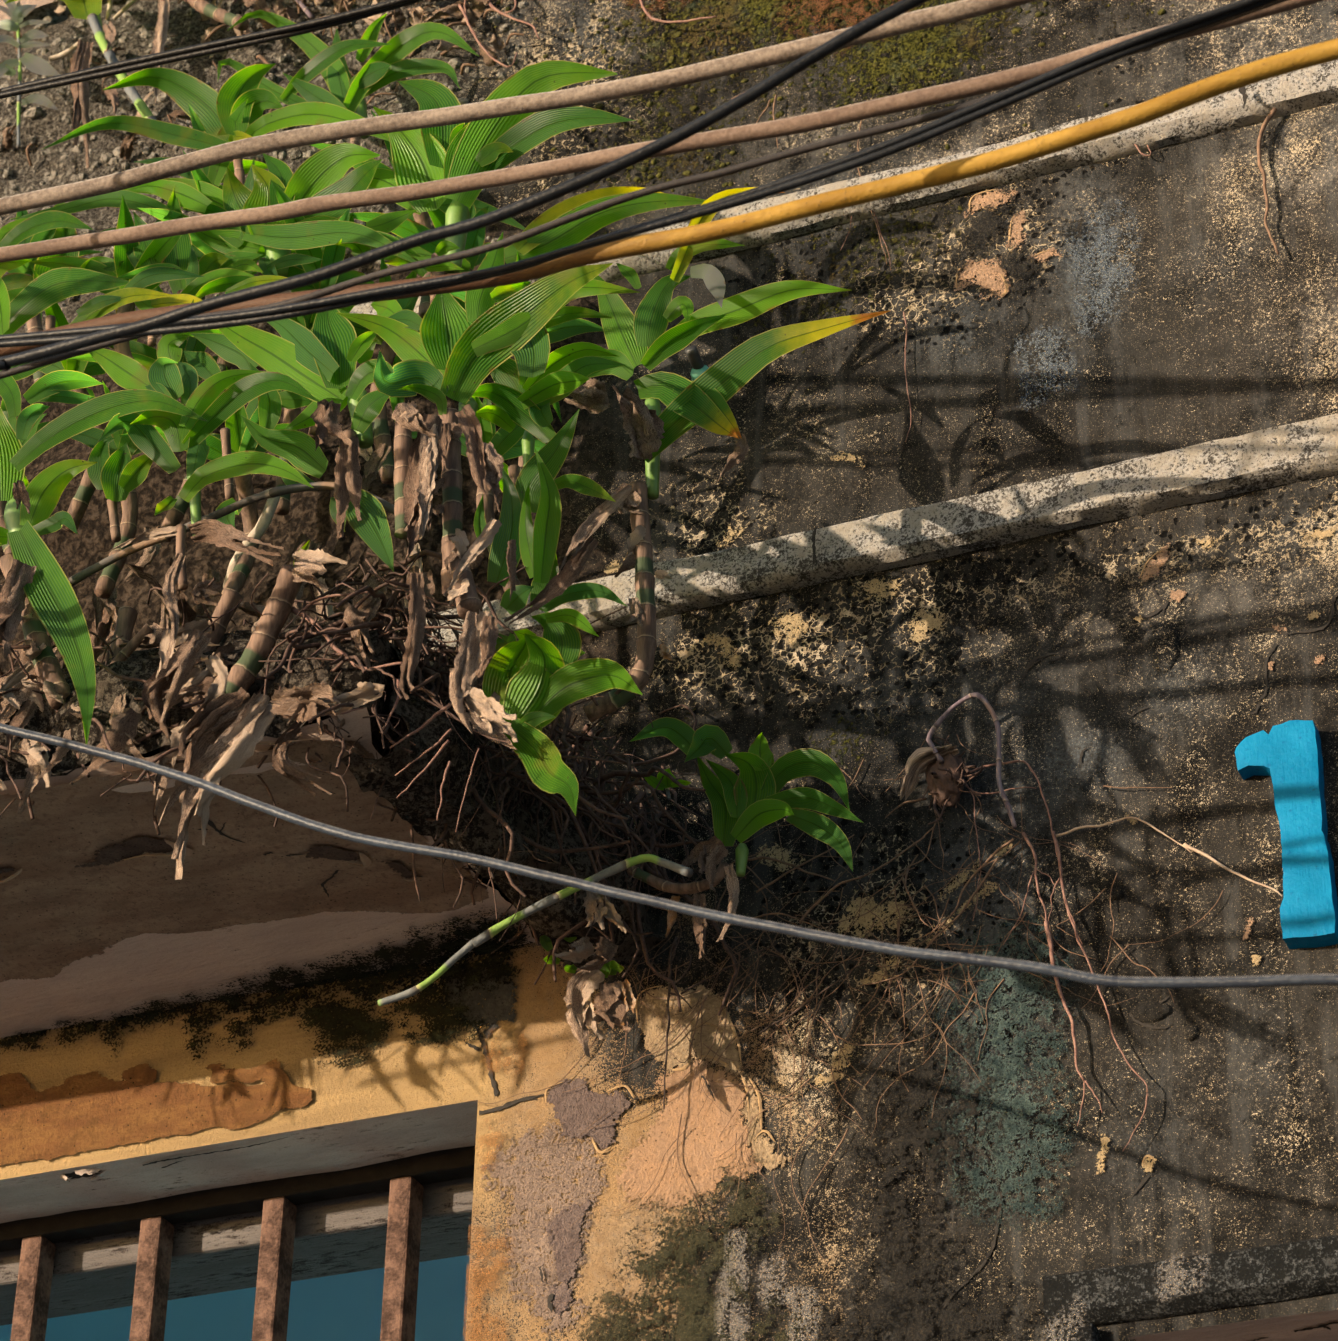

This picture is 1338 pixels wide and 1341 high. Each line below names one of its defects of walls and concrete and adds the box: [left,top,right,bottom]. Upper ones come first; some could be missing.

leakage [779,0,919,38]
spalling [953,189,1062,302]
leakage [0,740,533,1167]
peeling [480,985,791,1336]